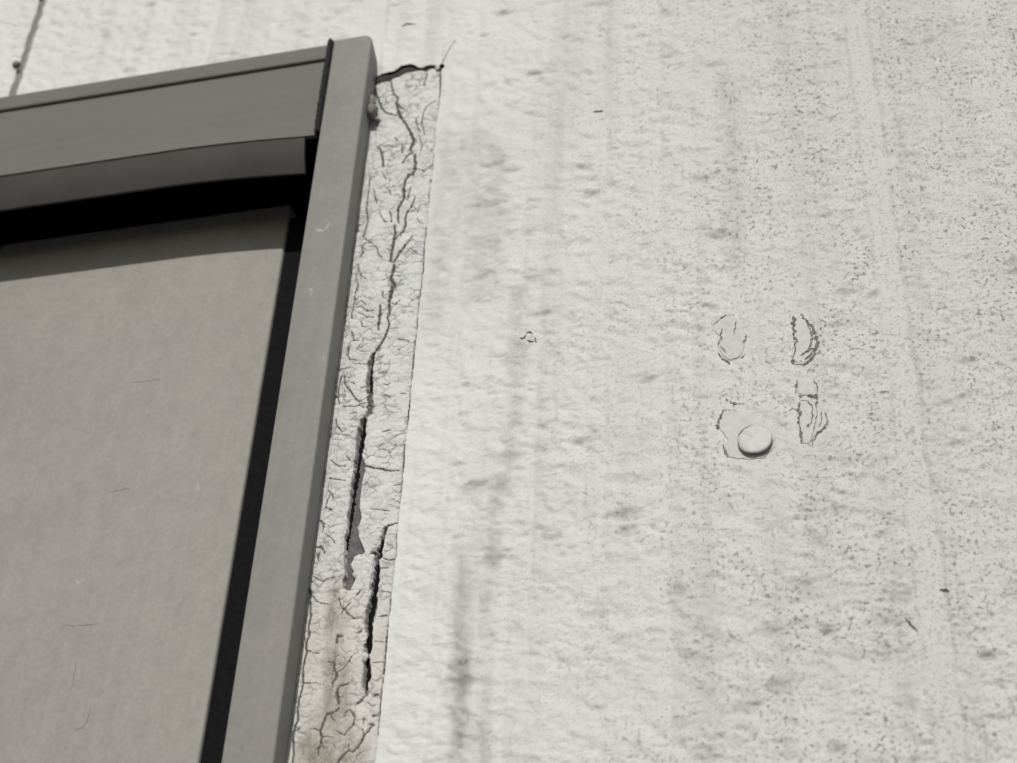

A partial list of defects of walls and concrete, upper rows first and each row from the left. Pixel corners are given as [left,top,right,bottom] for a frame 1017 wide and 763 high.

spalling [714,314,747,364]
spalling [790,314,820,366]
crack [292,39,456,763]
spalling [716,398,776,460]
spalling [795,379,828,445]